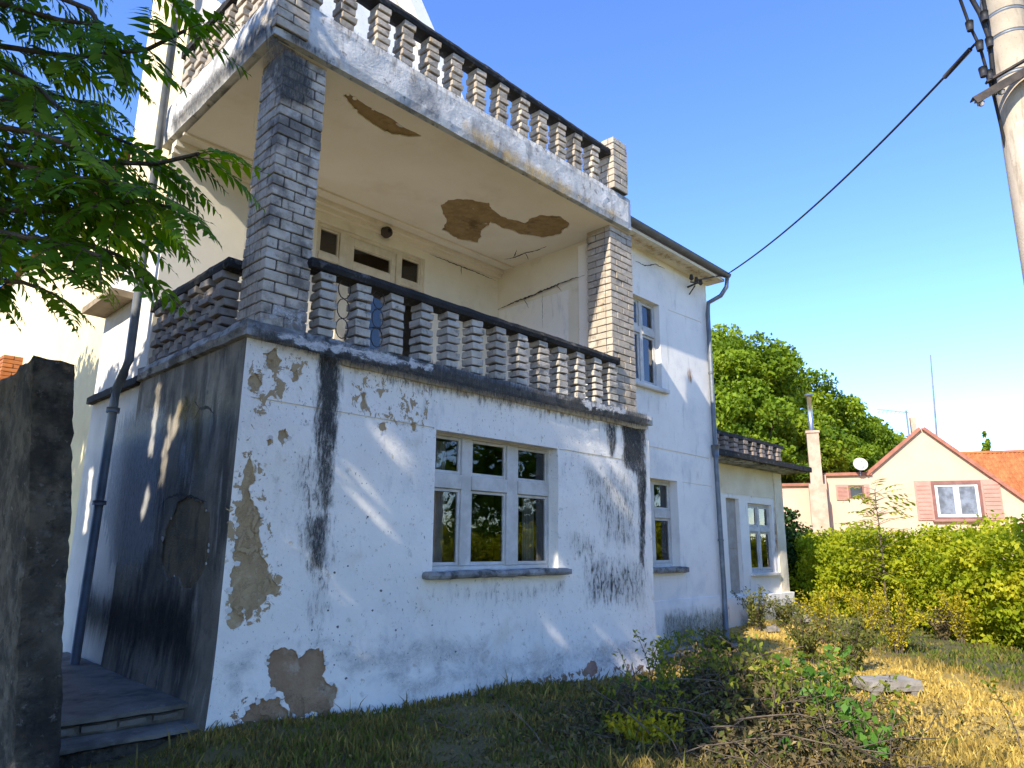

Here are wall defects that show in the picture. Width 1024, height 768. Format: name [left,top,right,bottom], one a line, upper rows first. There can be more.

crack [498,275,584,323]
peeling [247,348,308,426]
peeling [352,373,429,434]
leakage [104,407,165,569]
peeling [225,439,284,630]
leakage [255,304,648,624]
peeling [230,626,347,723]